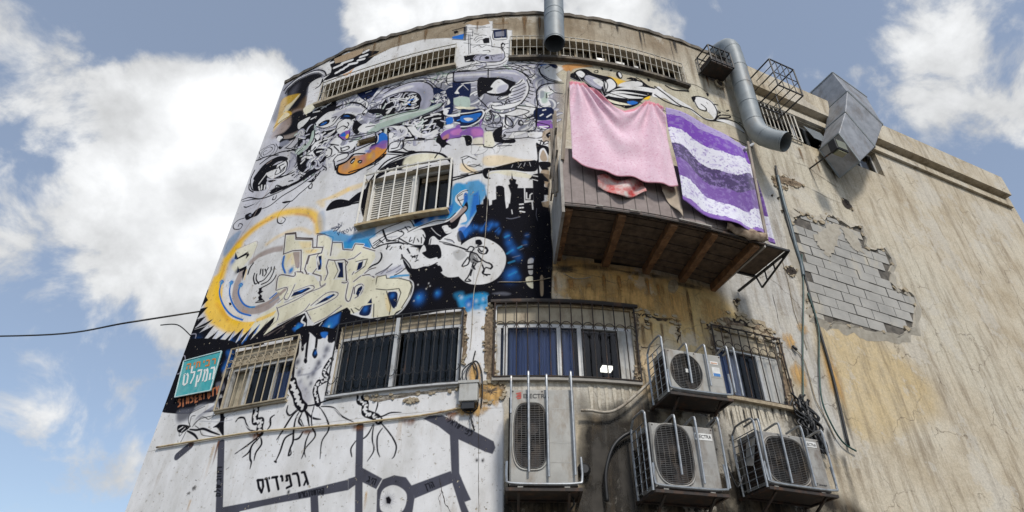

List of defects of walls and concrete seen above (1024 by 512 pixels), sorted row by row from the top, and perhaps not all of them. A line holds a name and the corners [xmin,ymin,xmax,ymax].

spalling [479,302,507,405]
damp [554,266,723,338]
damp [823,351,842,396]
flaking render [771,174,922,345]